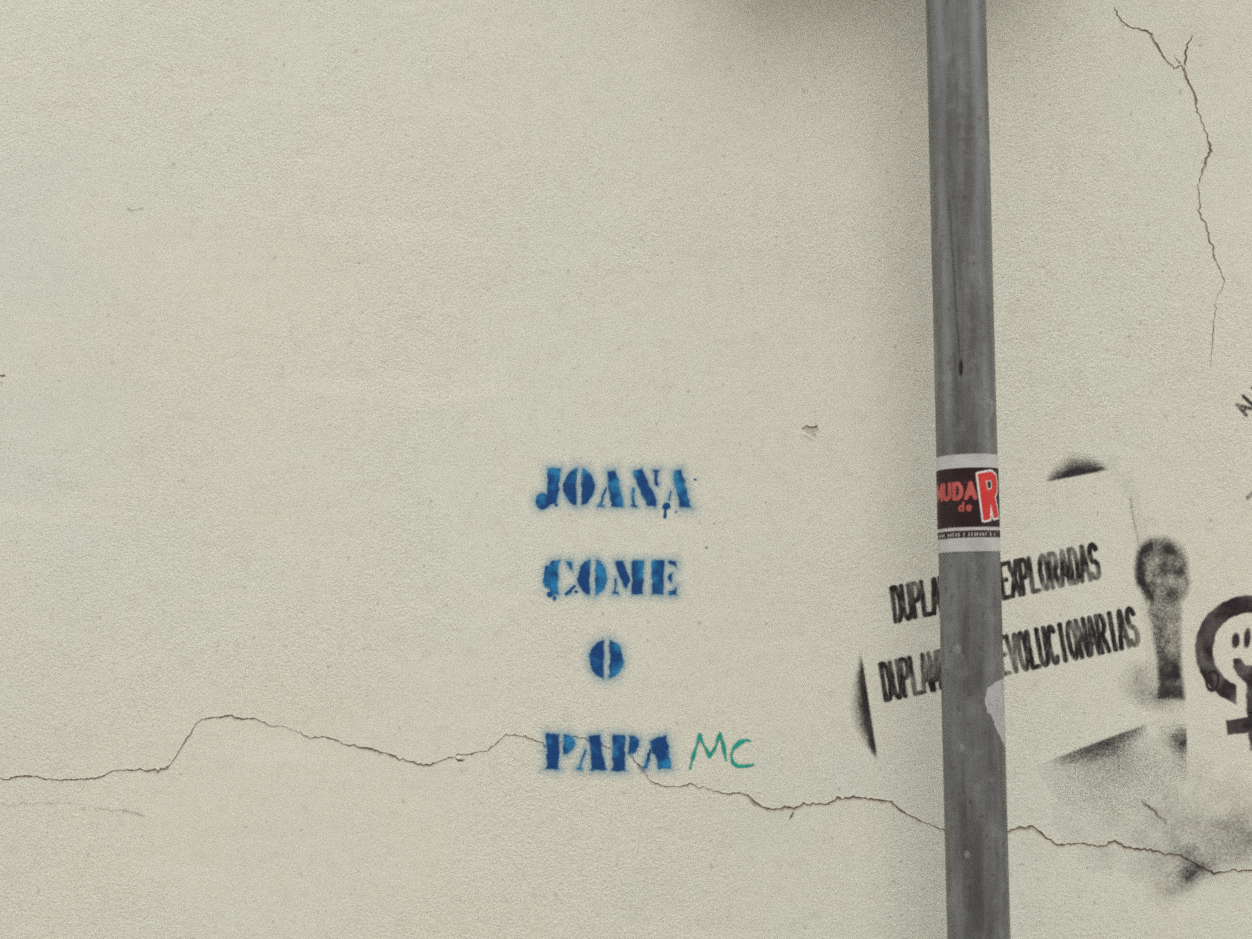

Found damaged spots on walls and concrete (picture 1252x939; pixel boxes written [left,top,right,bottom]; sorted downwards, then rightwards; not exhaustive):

crack [1113,7,1226,366]
crack [0,713,945,833]
crack [1008,823,1252,878]